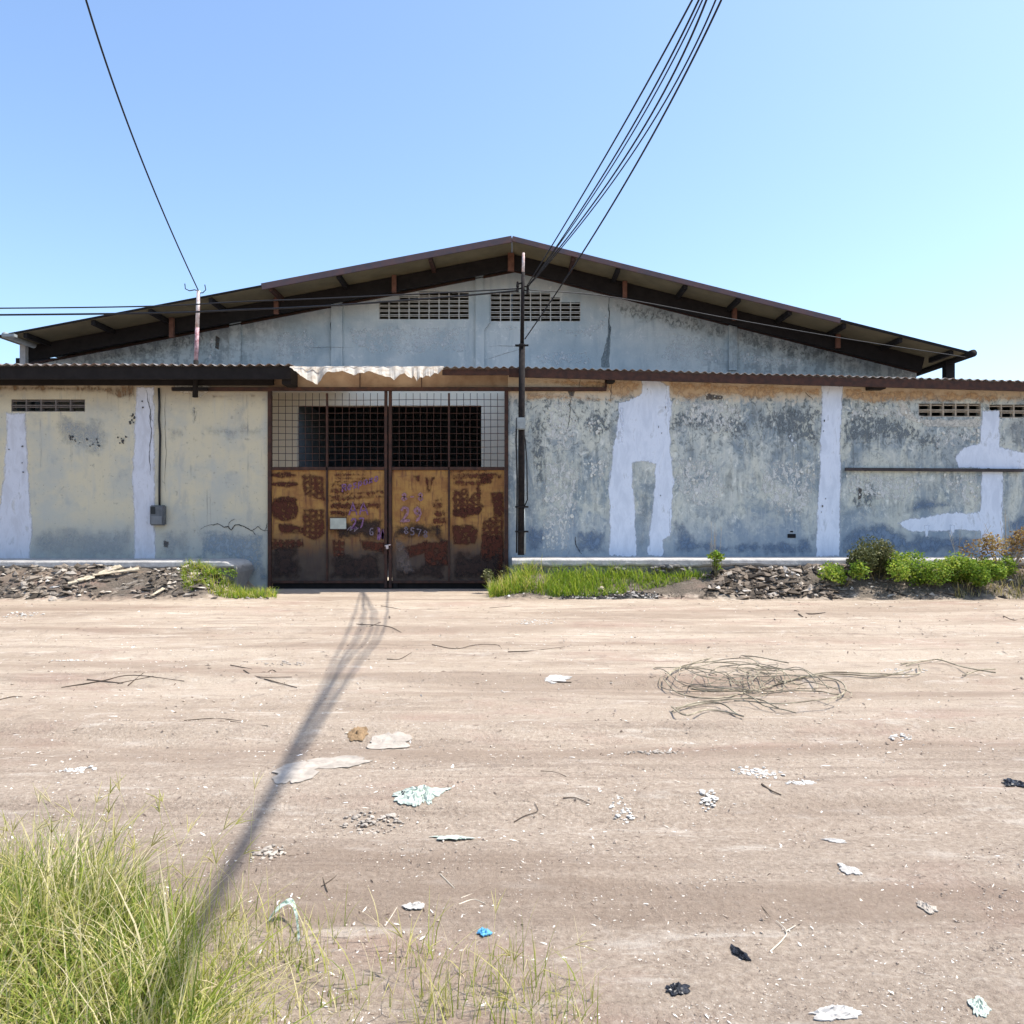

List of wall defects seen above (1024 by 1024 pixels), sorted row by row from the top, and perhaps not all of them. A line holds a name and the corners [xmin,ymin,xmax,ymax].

crack [601,304,612,401]
crack [201,519,268,535]
rust [272,472,384,578]
rust [397,470,504,579]
water stain [669,509,810,552]
water stain [847,525,971,552]